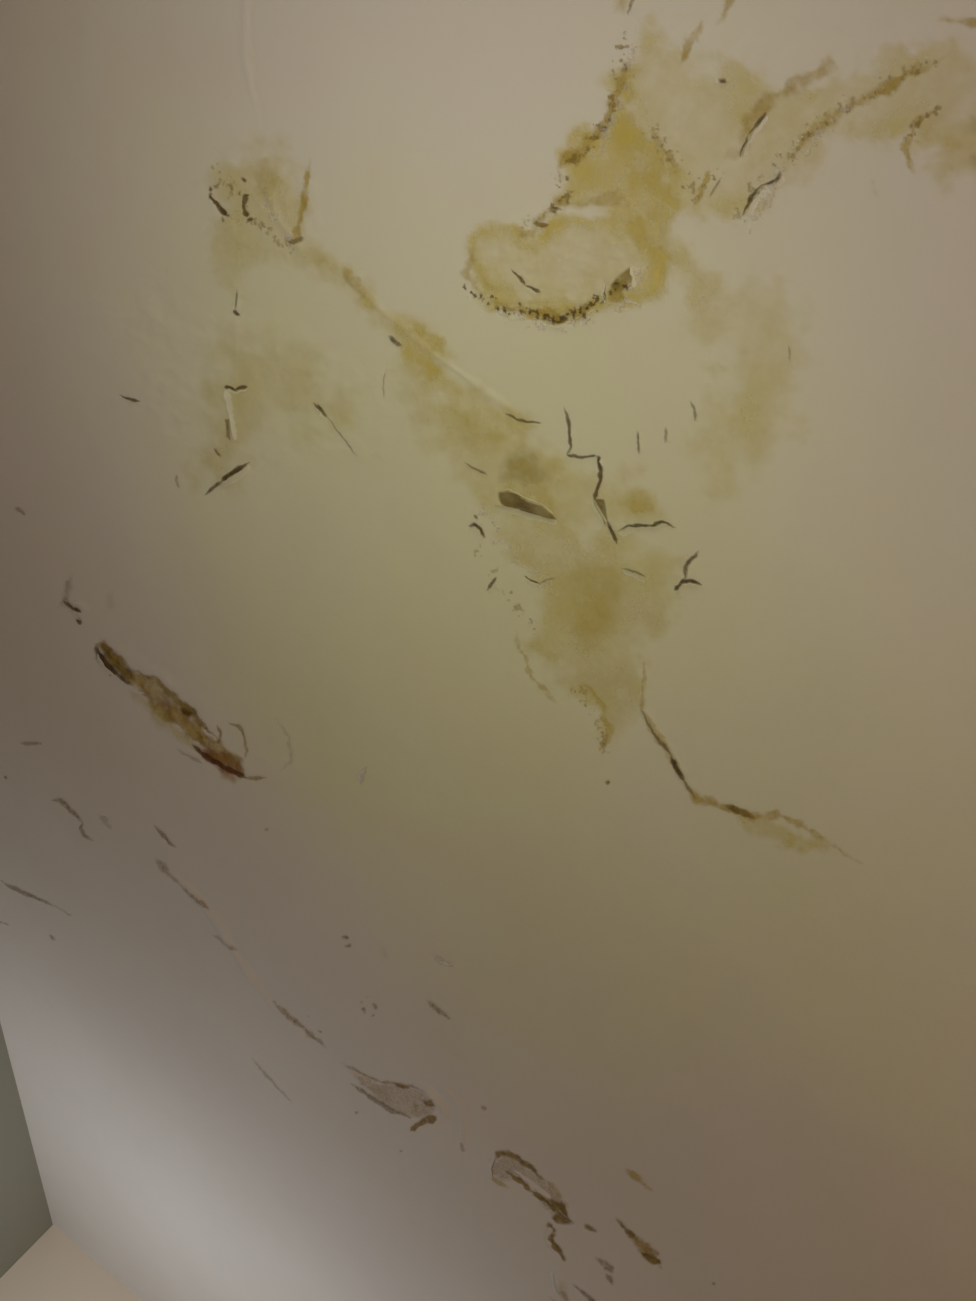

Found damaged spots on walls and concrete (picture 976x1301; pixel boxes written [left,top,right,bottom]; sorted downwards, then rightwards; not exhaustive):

damp [536,70,657,240]
damp [209,178,253,221]
damp [463,208,682,325]
peeling [566,414,617,541]
peeling [465,483,562,550]
crack [617,520,677,545]
spalling [89,643,240,765]
crack [643,703,697,779]
spalling [337,1063,454,1131]
spalling [481,1151,569,1259]
spalling [619,1223,660,1264]